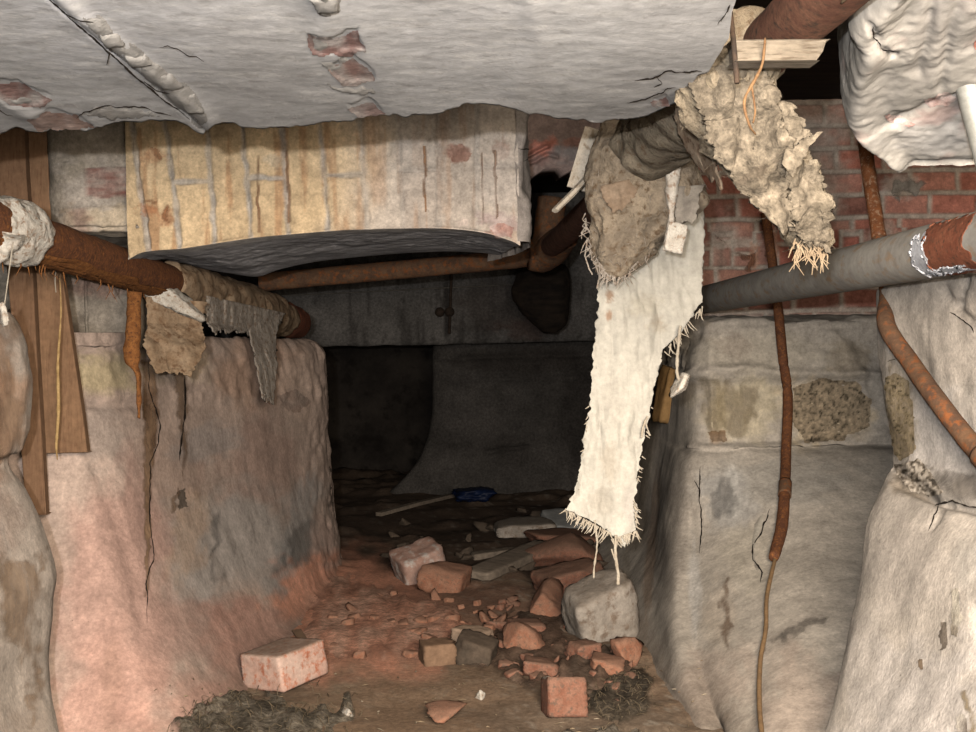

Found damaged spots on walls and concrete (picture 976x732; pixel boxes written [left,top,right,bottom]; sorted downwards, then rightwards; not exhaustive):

peeling [0,82,160,132]
spalling [792,378,872,443]
spalling [884,373,943,497]
crack [694,471,702,553]
crack [752,511,769,582]
crack [928,499,976,531]